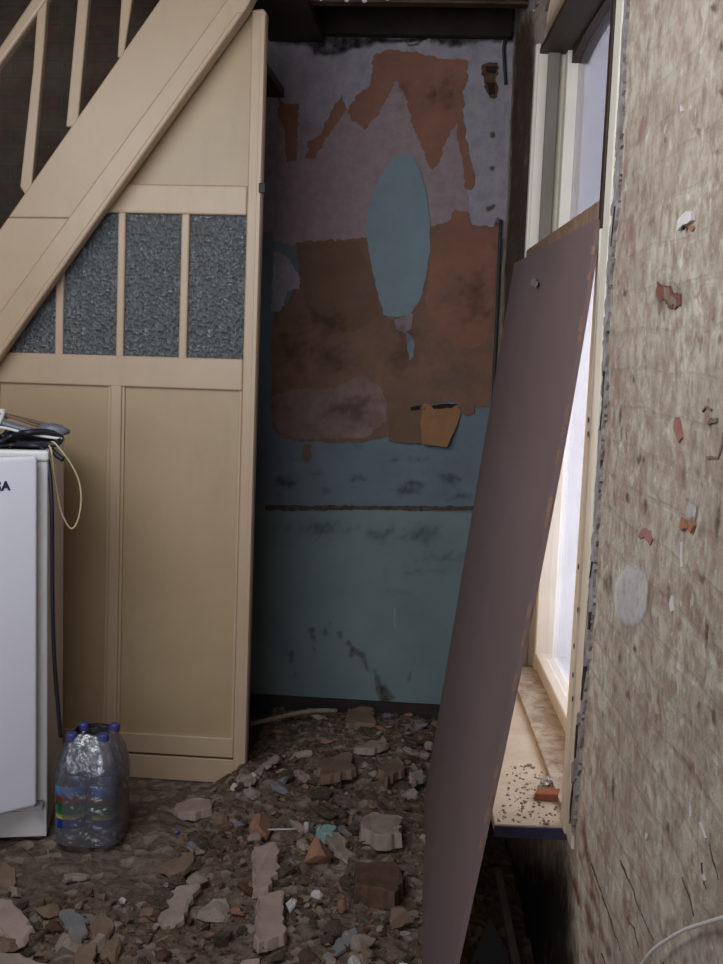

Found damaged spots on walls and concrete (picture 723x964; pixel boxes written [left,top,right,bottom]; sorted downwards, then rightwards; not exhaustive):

flaking render [277,39,381,126]
flaking render [465,47,506,226]
flaking render [270,251,300,312]
peeling [365,154,430,360]
spalling [656,282,682,310]